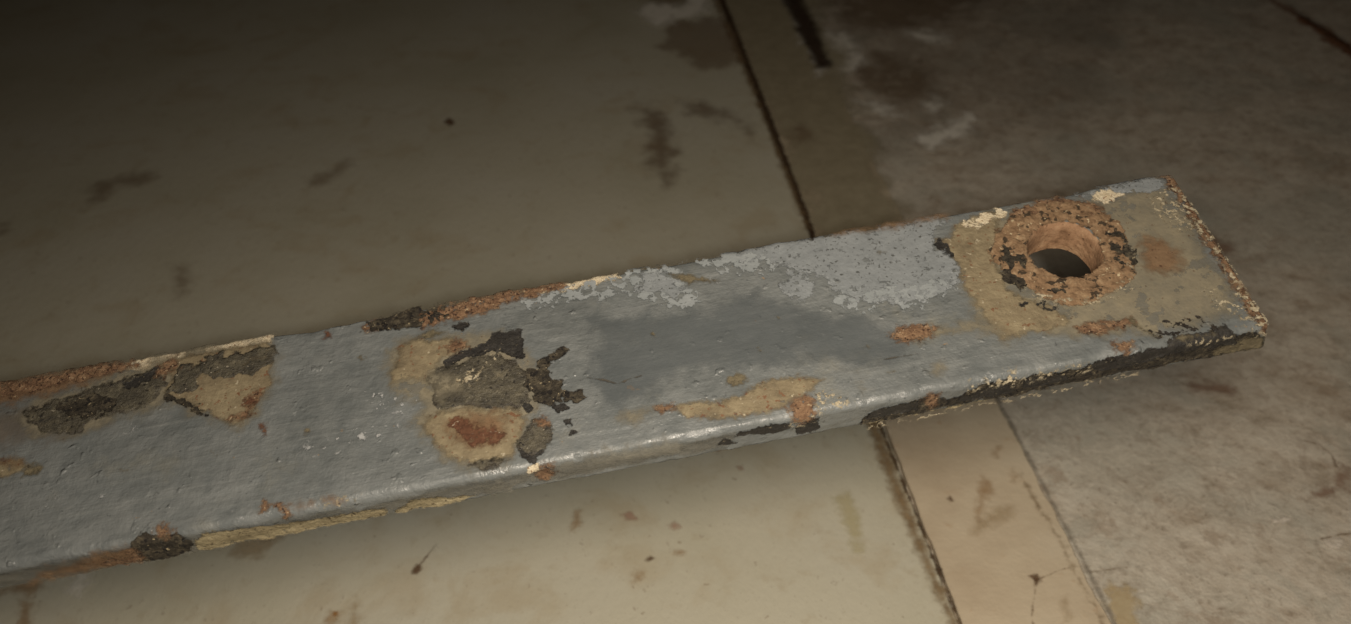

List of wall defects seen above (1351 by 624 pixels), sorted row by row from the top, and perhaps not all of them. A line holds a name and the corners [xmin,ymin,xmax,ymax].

rust [988,195,1180,307]
rust [0,358,140,399]
peeling [20,341,279,438]
peeling [389,321,538,466]
rust [362,282,587,481]
peeling [677,377,822,445]
peeling [520,176,1261,425]
rust [890,324,937,343]
rust [1075,318,1137,355]